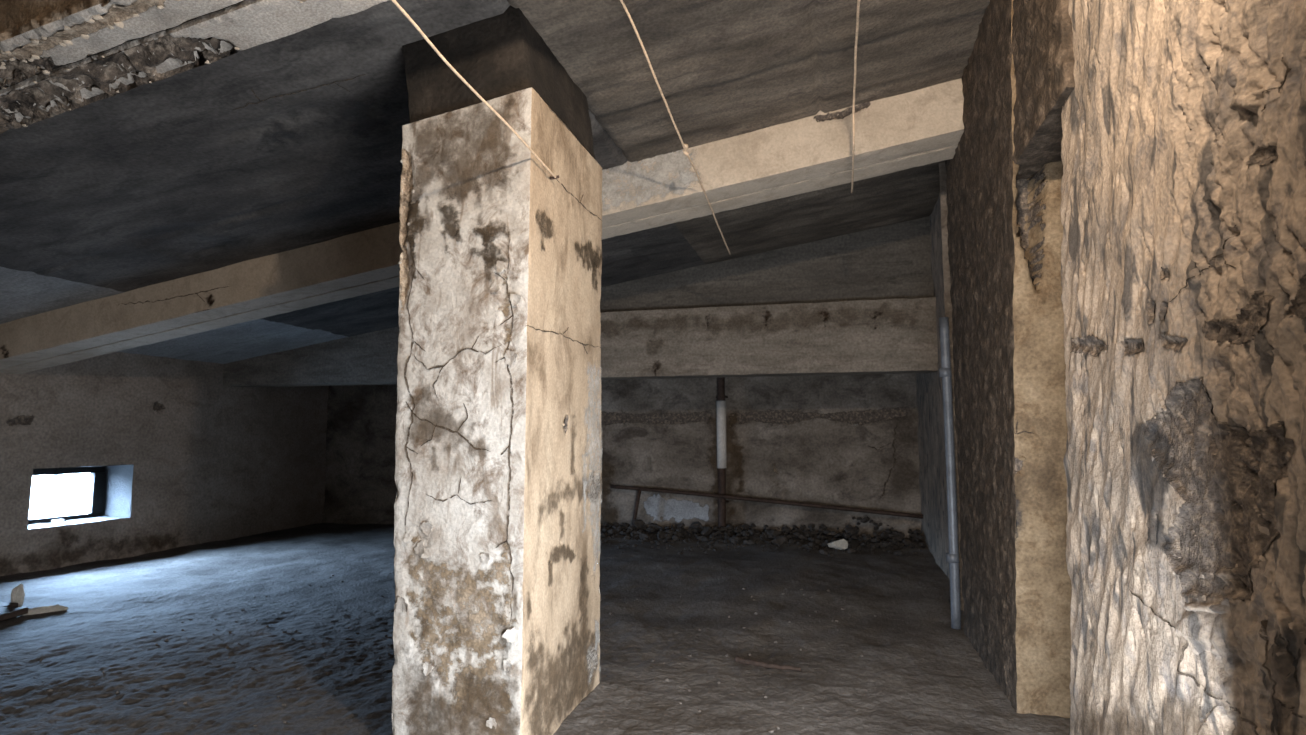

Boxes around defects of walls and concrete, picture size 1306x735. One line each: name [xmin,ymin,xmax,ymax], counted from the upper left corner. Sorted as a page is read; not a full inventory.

spalling [0,0,240,134]
damp [536,211,553,251]
crack [557,180,601,220]
damp [575,241,602,292]
spalling [1015,164,1047,286]
damp [411,391,484,465]
crack [404,226,598,627]
spalling [1142,377,1295,605]
damp [409,431,618,735]